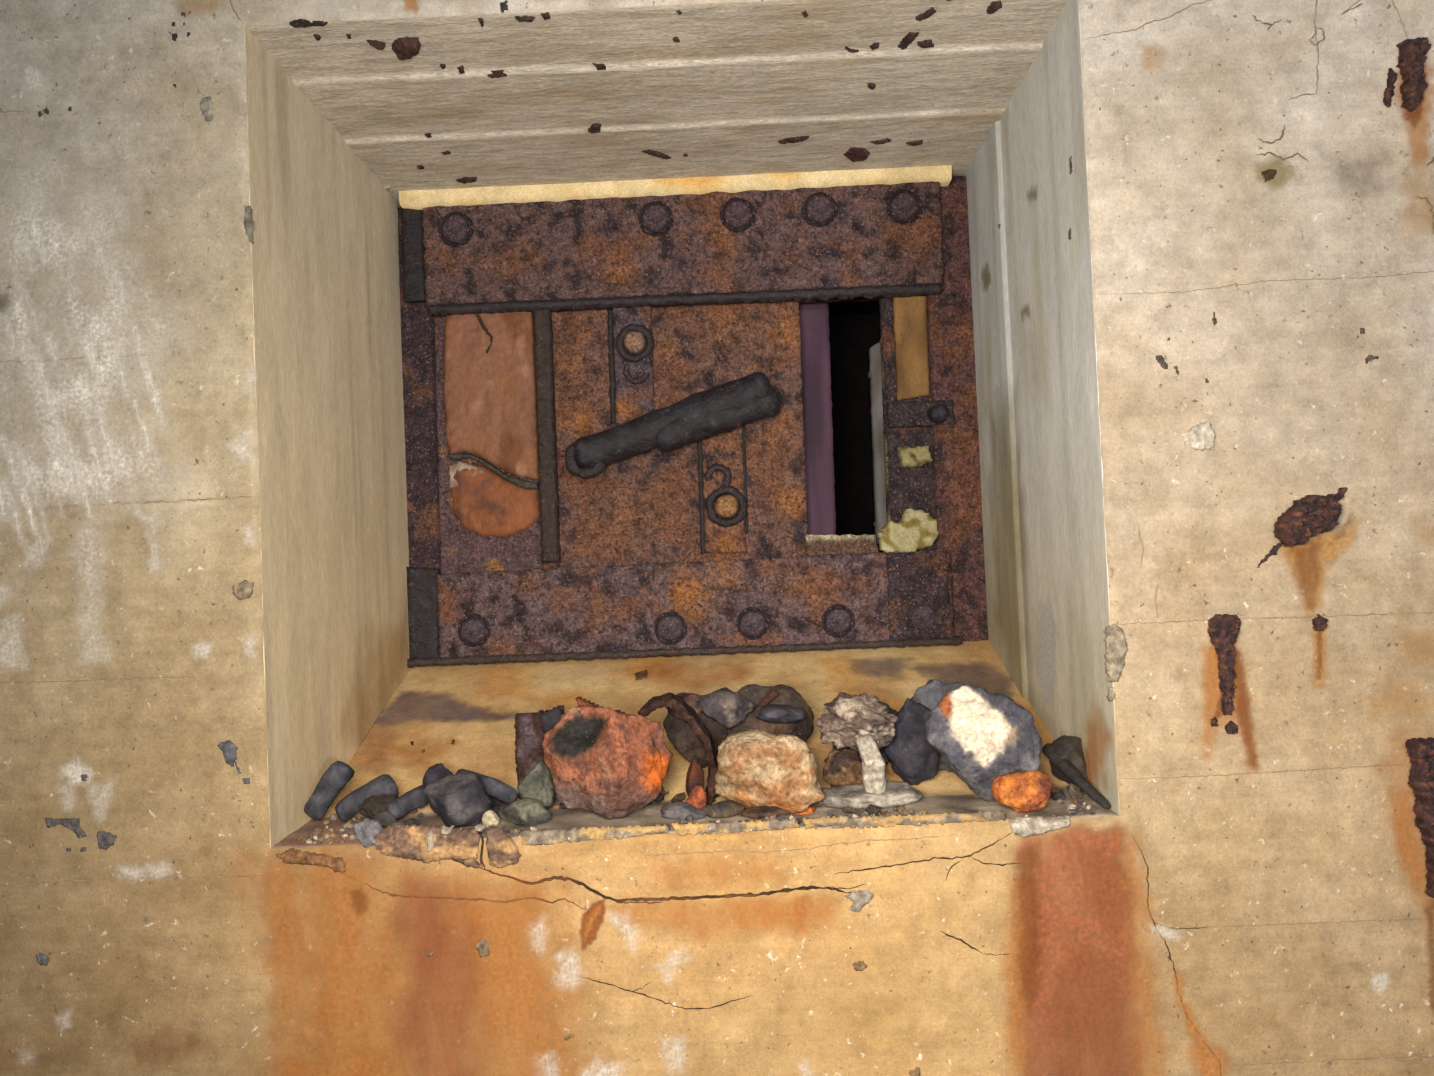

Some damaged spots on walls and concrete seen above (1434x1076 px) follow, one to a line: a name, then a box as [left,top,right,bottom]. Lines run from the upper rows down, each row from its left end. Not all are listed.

crack [1082,0,1207,41]
crack [1289,0,1408,100]
corrosion [1383,37,1431,157]
corrosion [451,461,540,538]
corrosion [1257,487,1354,686]
corrosion [1207,614,1255,765]
corrosion [580,900,605,949]
crack [281,833,1021,910]
crack [940,931,1013,956]
corrosion [1009,828,1152,1076]
crack [1133,837,1434,1067]
corrosion [1398,737,1434,1003]